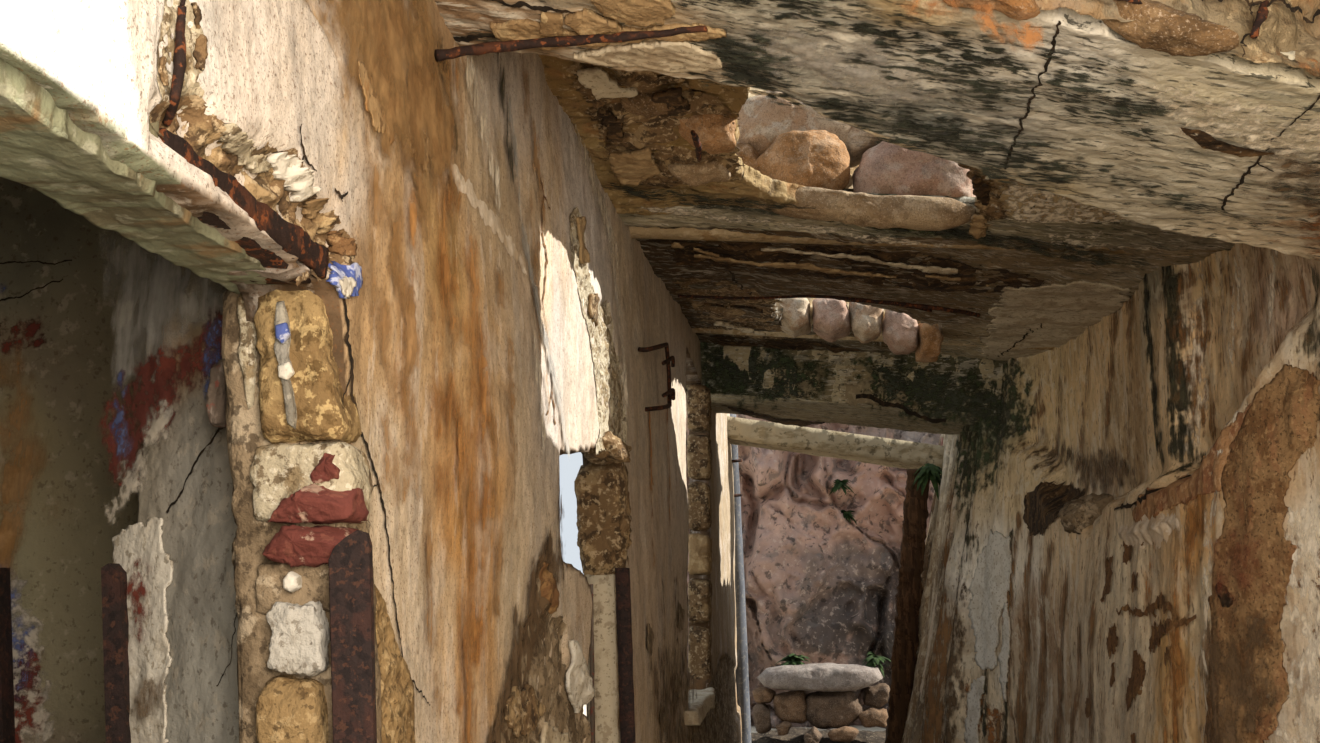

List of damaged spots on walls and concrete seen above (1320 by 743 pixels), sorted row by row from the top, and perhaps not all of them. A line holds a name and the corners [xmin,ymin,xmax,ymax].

corrosion [162,0,187,127]
flaking render [149,0,363,299]
corrosion [434,25,708,85]
crack [1004,21,1061,169]
corrosion [1249,0,1269,39]
crack [1202,0,1320,57]
crack [1221,95,1320,211]
water stain [575,0,1320,743]
peeling [99,309,223,743]
crack [342,299,430,706]
flaking render [1132,364,1320,743]
flaking render [500,561,594,743]